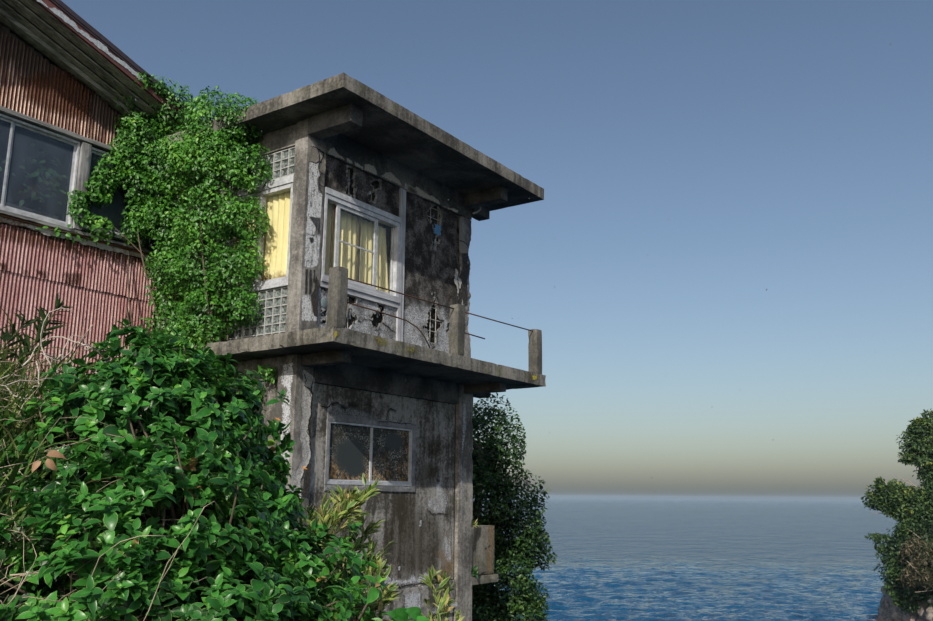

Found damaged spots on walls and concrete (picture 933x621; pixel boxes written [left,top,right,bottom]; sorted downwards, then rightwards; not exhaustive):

peeling [36,0,144,82]
rust [20,70,91,119]
flaking render [346,166,357,198]
peeling [302,148,328,326]
flaking render [346,294,361,329]
flaking render [370,304,386,331]
damp [385,499,451,608]